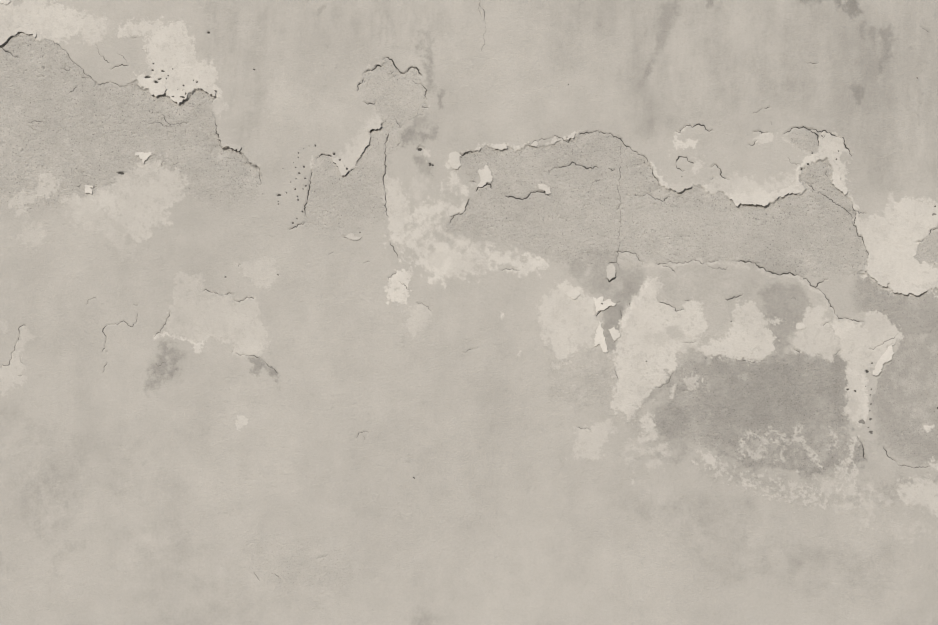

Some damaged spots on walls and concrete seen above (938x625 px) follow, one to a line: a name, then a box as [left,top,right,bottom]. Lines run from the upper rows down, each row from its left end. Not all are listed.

spalling [0,0,263,269]
spalling [277,57,938,554]
water stain [541,239,938,625]